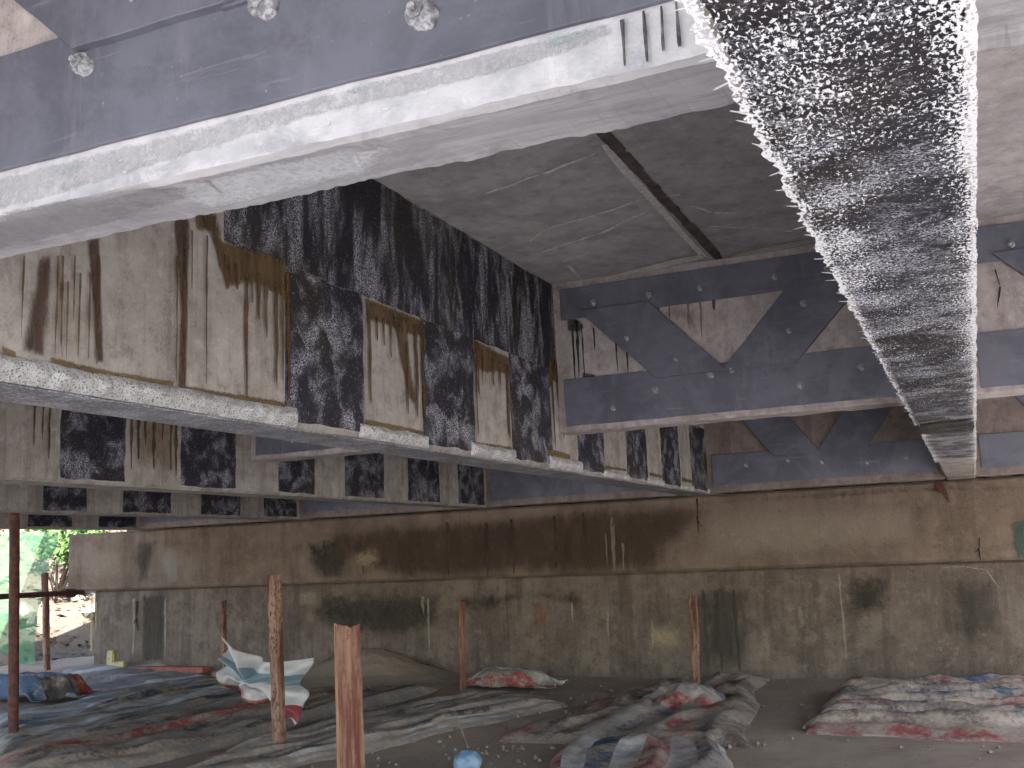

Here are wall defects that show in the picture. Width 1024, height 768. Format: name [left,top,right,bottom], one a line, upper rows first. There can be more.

corrosion [3,214,291,407]
corrosion [365,299,427,435]
corrosion [474,340,512,450]
damp [322,510,688,577]
crack [695,498,703,533]
damp [698,590,745,669]